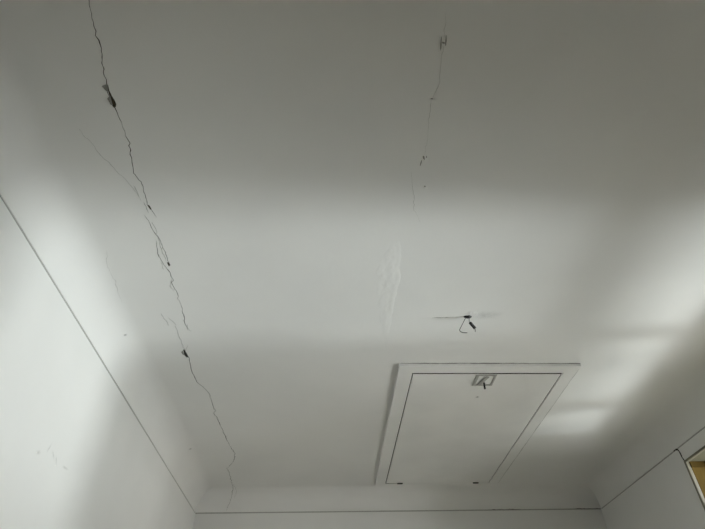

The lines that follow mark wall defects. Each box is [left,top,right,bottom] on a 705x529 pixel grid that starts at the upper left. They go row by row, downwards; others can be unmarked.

crack [79,5,237,508]